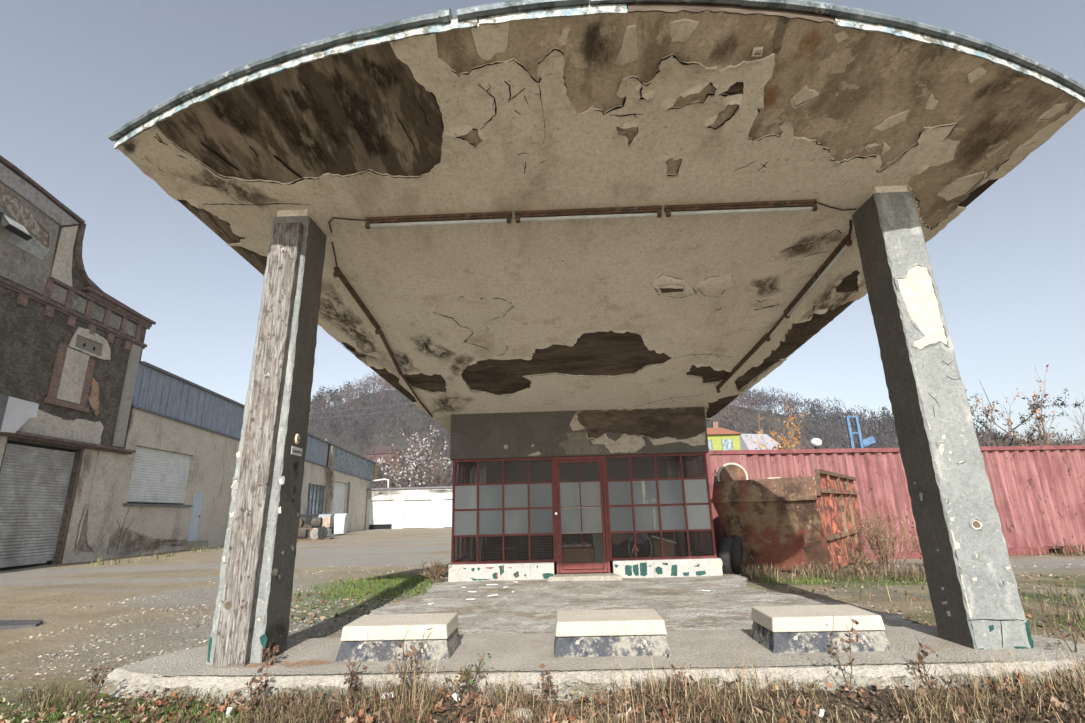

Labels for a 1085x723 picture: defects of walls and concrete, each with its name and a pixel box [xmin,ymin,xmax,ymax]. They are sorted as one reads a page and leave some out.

spalling [157,42,488,185]
peeling [436,10,1077,231]
peeling [895,263,949,350]
spalling [370,365,448,402]
spalling [459,329,671,396]
spalling [558,265,863,456]
peeling [462,565,526,581]
peeling [614,559,723,576]